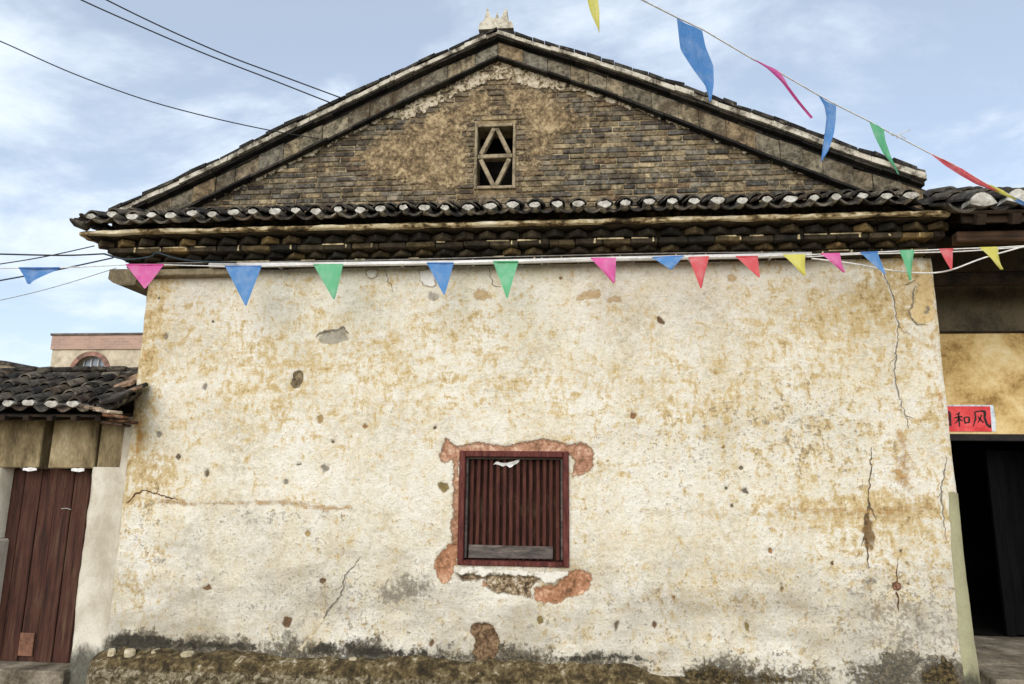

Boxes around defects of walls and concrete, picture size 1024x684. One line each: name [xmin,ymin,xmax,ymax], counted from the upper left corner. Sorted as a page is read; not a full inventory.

spalling [480,138,513,186]
spalling [316,326,349,344]
crack [880,271,914,428]
spalling [290,370,303,388]
crack [126,484,178,504]
crack [861,447,876,566]
spalling [433,438,594,624]
crack [298,556,362,651]
leakage [110,633,256,650]
leakage [305,641,475,659]
spalling [470,622,500,662]
leakage [516,653,651,663]